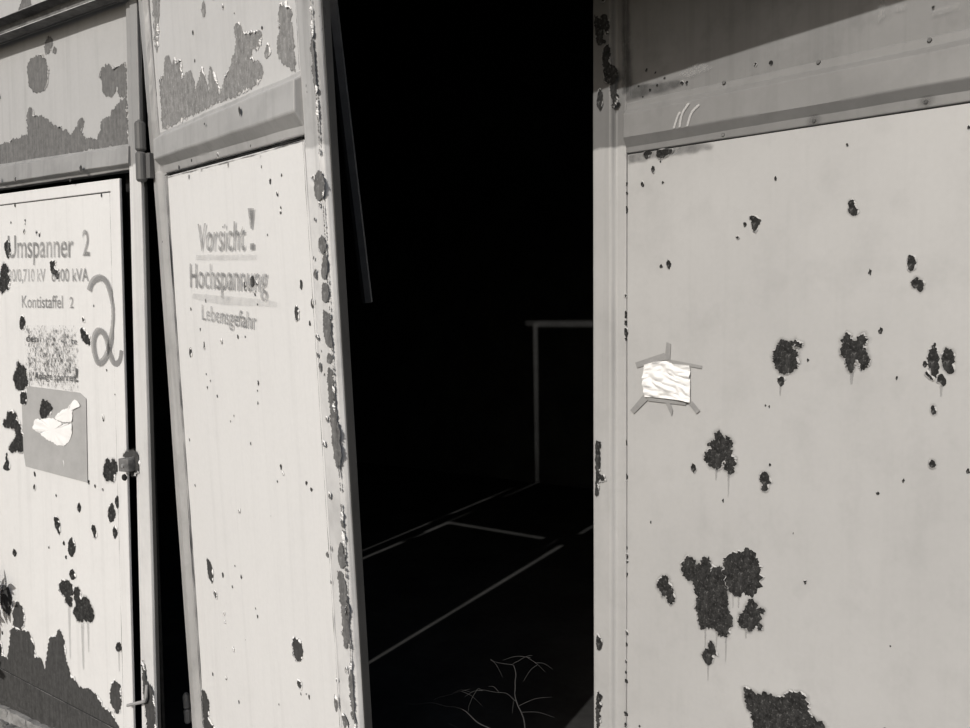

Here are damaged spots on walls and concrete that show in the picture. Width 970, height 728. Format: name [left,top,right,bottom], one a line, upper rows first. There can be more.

peeling [27,36,57,94]
peeling [0,62,129,164]
peeling [152,0,296,129]
peeling [309,0,321,154]
rust [594,14,619,111]
peeling [0,584,122,728]